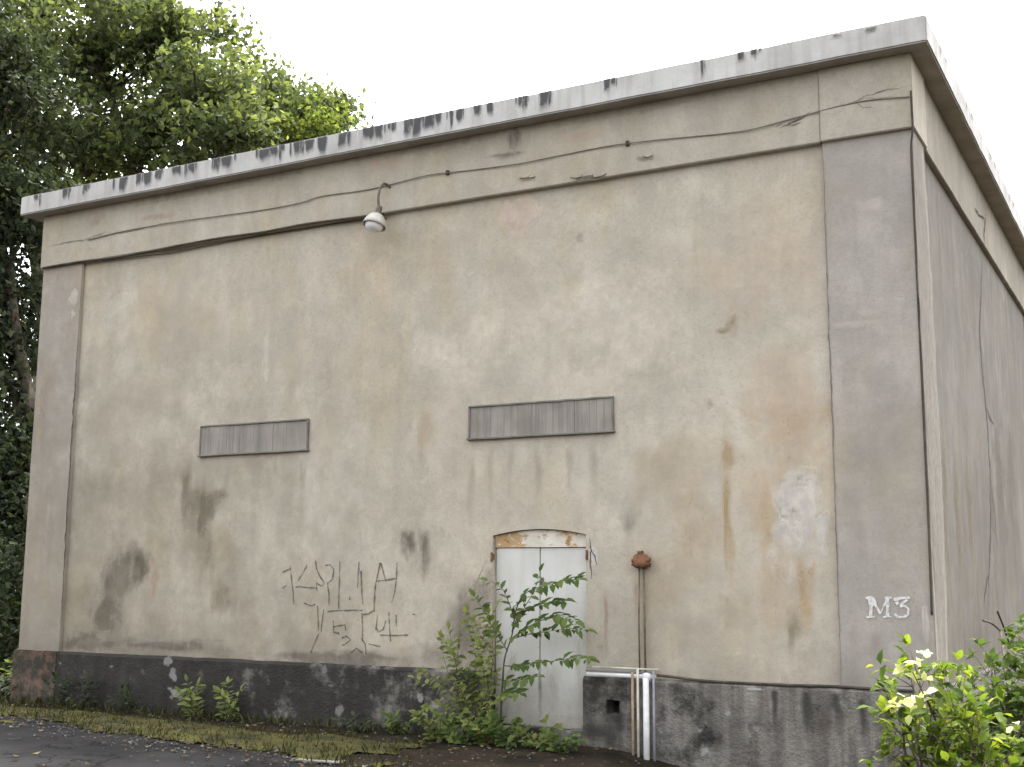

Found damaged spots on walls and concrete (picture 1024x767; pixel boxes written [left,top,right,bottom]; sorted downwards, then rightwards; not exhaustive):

leakage [62,184,90,199]
leakage [112,162,197,192]
leakage [212,154,236,172]
crack [979,277,997,601]
leakage [182,470,225,563]
leakage [401,532,430,573]
leakage [62,544,219,651]
leakage [279,650,396,665]